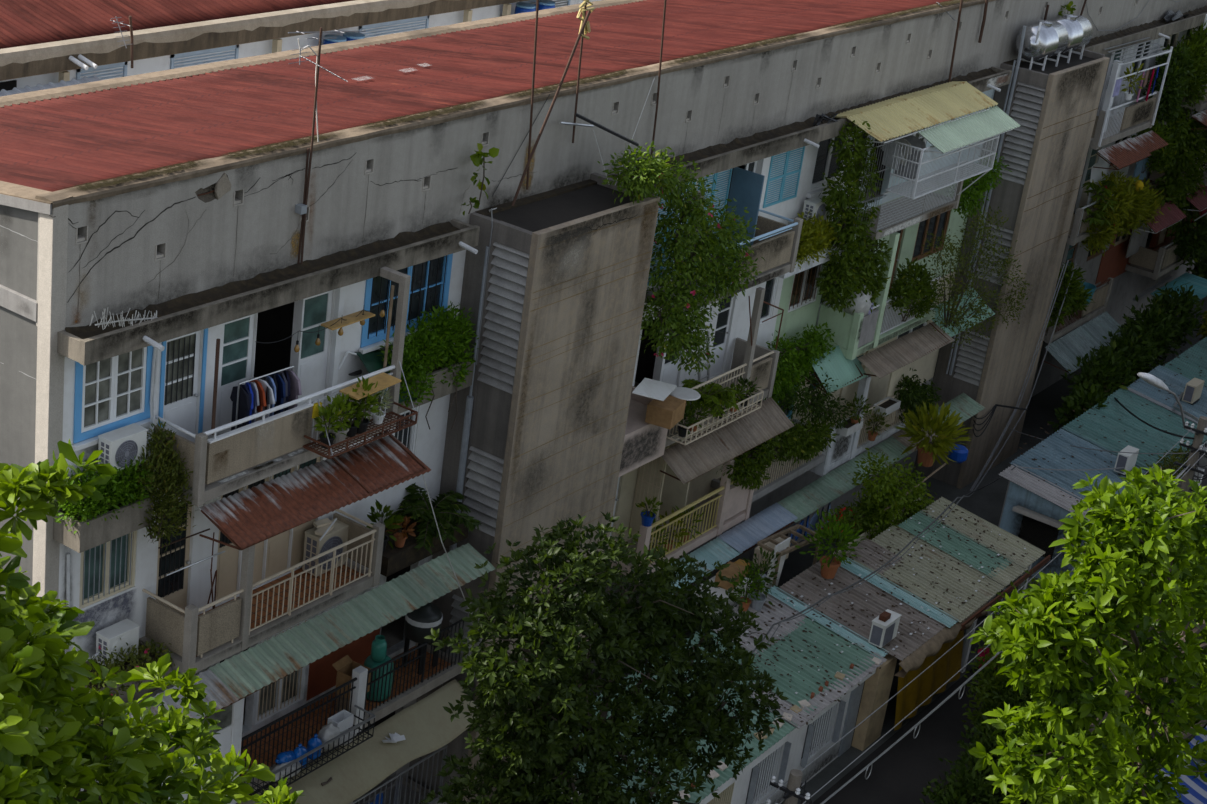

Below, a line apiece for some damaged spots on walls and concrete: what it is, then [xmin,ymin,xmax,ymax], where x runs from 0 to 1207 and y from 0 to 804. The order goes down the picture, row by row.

crack [0,197,206,324]
crack [233,153,535,277]
damp [530,202,658,312]
damp [503,306,660,528]